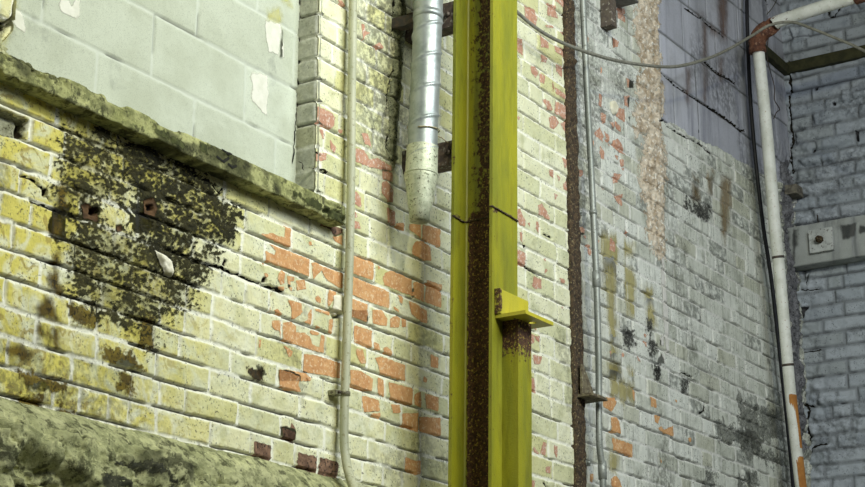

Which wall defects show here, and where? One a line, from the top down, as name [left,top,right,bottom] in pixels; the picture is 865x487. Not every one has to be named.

peeling [60,0,80,18]
peeling [265,21,284,57]
peeling [251,72,269,115]
crack [385,70,394,154]
crack [659,120,710,154]
crack [661,73,744,133]
crack [704,62,735,85]
crack [787,61,795,174]
leakage [36,116,246,400]
leakage [600,235,655,402]
leakage [6,346,75,415]
crack [804,390,827,451]